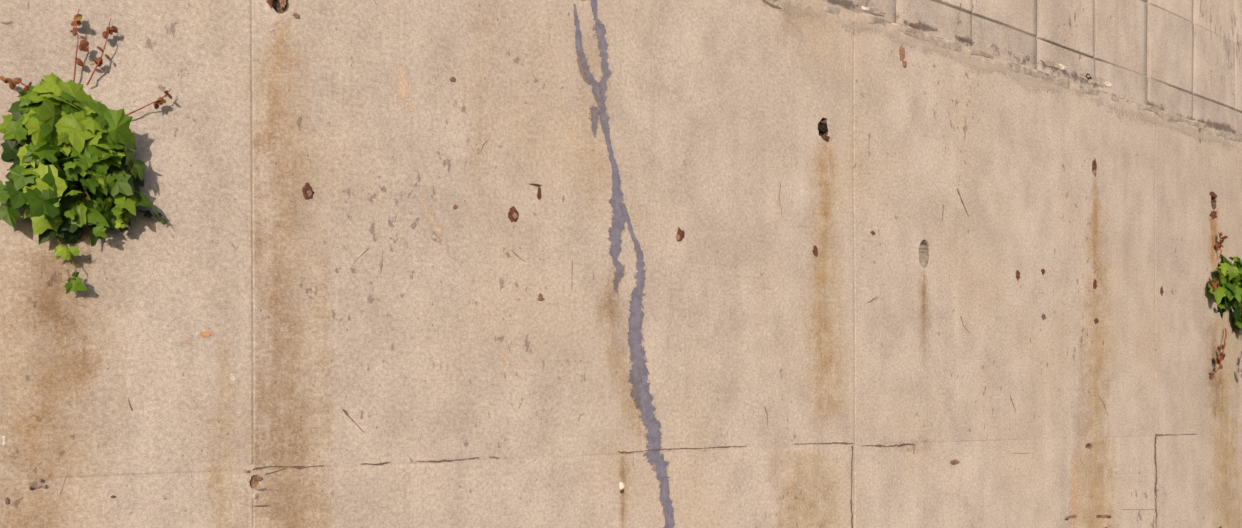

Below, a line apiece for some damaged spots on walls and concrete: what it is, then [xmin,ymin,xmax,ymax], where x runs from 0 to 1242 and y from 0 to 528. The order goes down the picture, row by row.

crack [574,0,675,528]